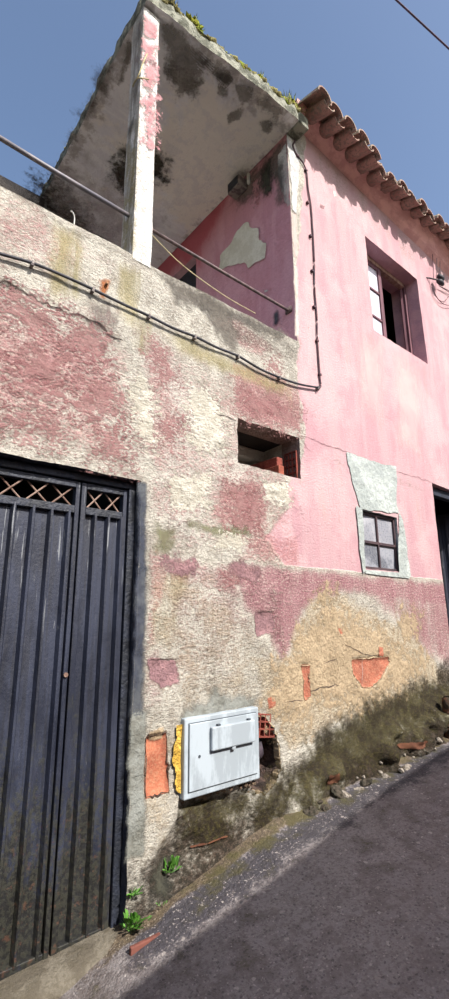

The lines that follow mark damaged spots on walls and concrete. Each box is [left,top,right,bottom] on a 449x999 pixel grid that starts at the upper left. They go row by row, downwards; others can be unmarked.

spalling [77,15,283,150]
water stain [108,117,134,192]
water stain [154,145,173,183]
water stain [237,140,289,209]
spalling [278,134,300,213]
flaking render [219,222,266,269]
peeling [0,266,308,591]
peeling [347,452,411,578]
spalling [144,728,170,799]
spalling [177,580,433,848]
water stain [253,676,449,828]